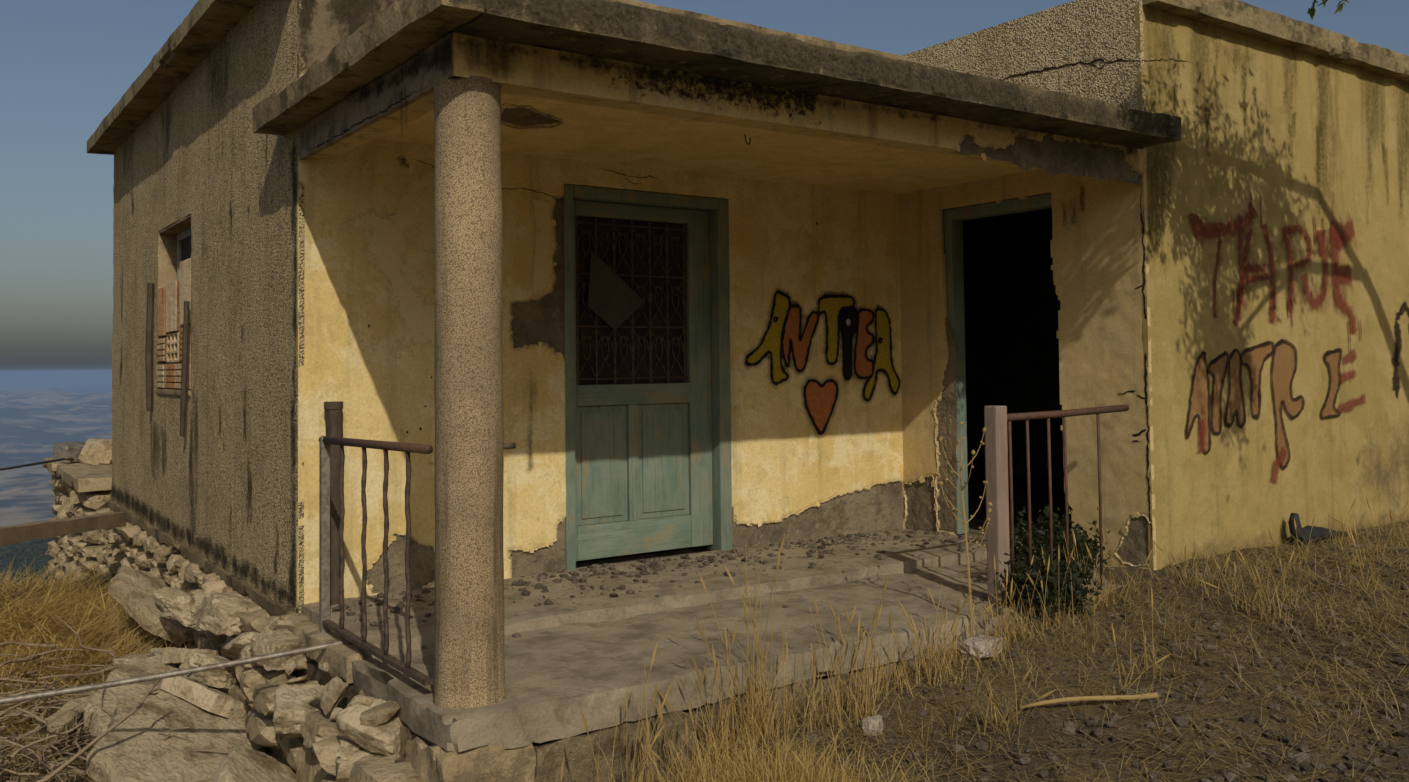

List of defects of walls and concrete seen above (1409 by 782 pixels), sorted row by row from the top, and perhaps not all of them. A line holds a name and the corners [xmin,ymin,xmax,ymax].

damp [298,0,391,69]
damp [526,0,1175,244]
spalling [955,127,1142,186]
crack [999,58,1191,80]
damp [1317,65,1329,180]
flaking render [509,196,564,359]
damp [111,361,298,612]
flaking render [732,317,959,548]
flaking render [367,528,435,593]